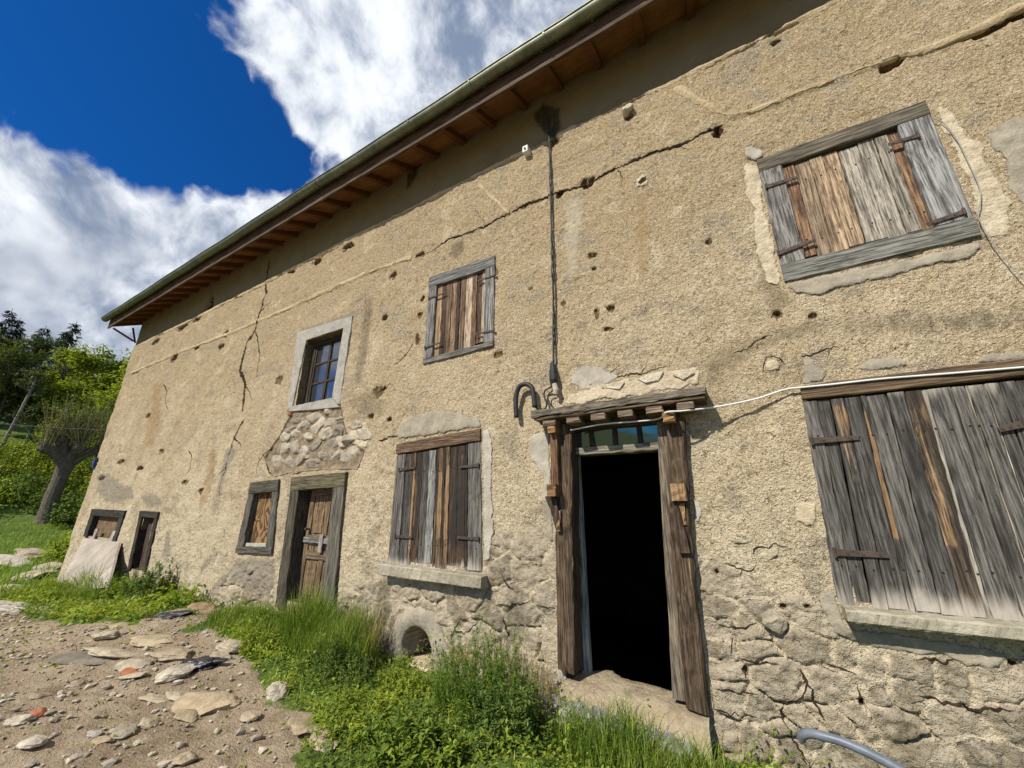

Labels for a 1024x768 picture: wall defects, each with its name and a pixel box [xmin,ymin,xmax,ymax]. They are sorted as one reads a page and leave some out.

crack [428,124,723,253]
crack [218,261,305,496]
spalling [264,404,374,477]